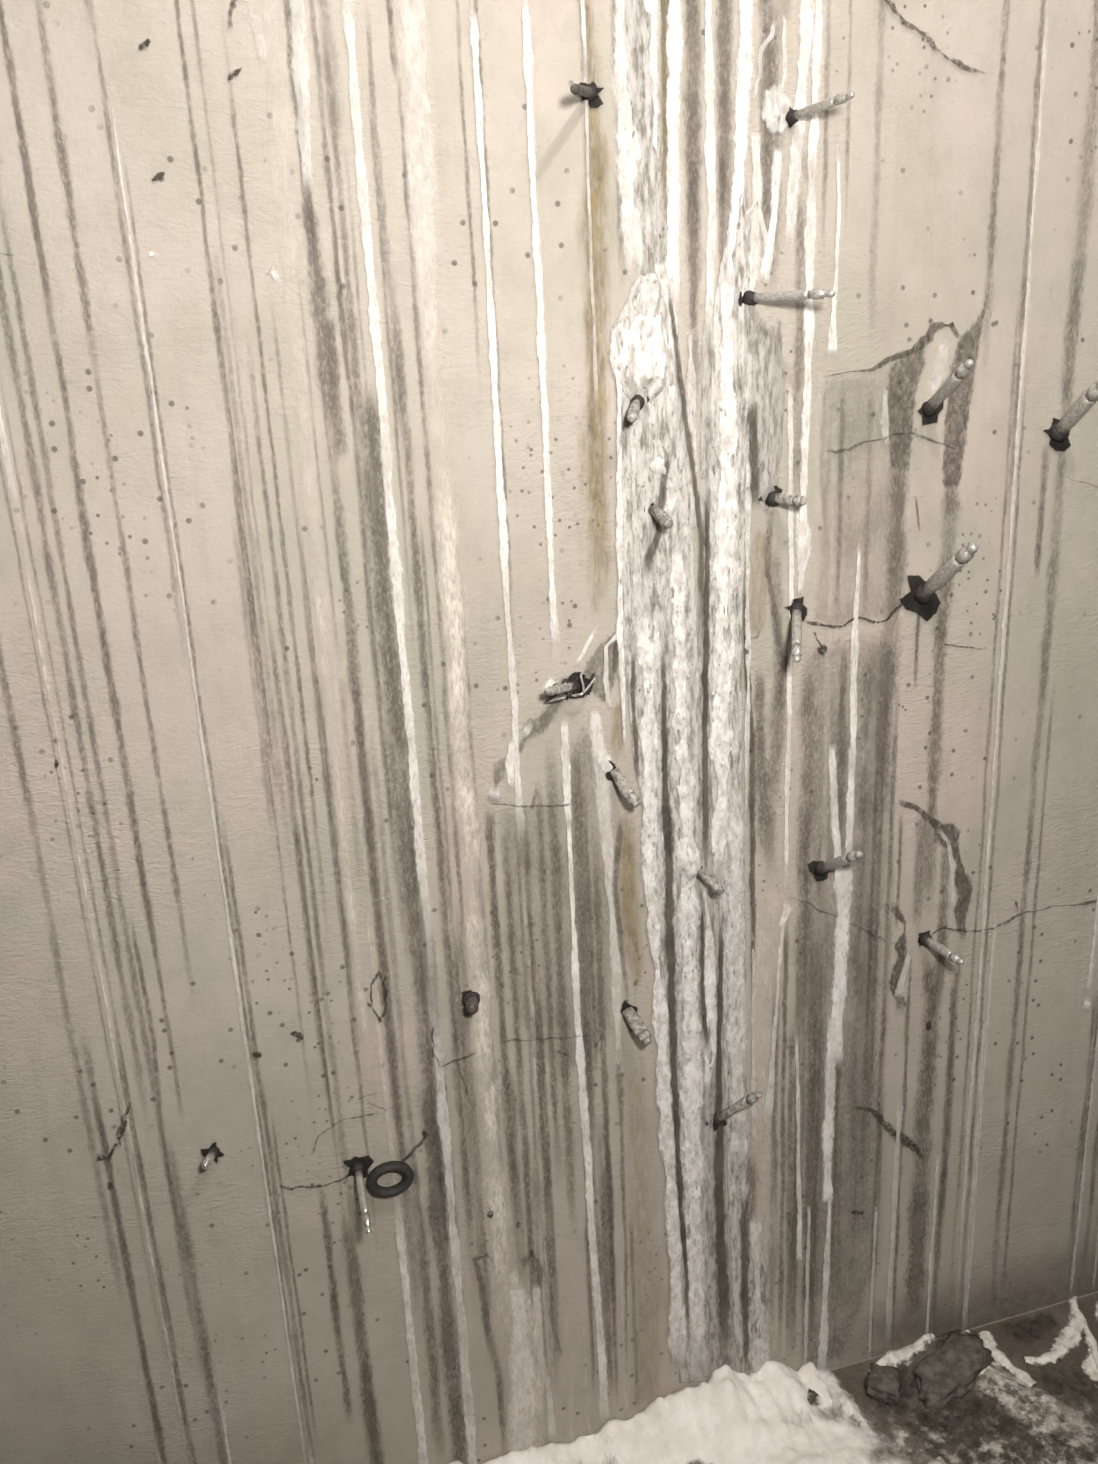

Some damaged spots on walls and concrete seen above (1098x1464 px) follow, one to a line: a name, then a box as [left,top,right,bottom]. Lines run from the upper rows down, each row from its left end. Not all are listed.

crack [885,0,977,72]
water stain [0,3,49,295]
water stain [52,102,74,227]
water stain [138,303,165,488]
water stain [1015,283,1031,462]
water stain [72,453,123,748]
water stain [286,0,621,1464]
water stain [609,0,895,1382]
crack [808,602,903,646]
water stain [78,805,163,1272]
water stain [125,773,151,920]
water stain [215,836,257,1059]